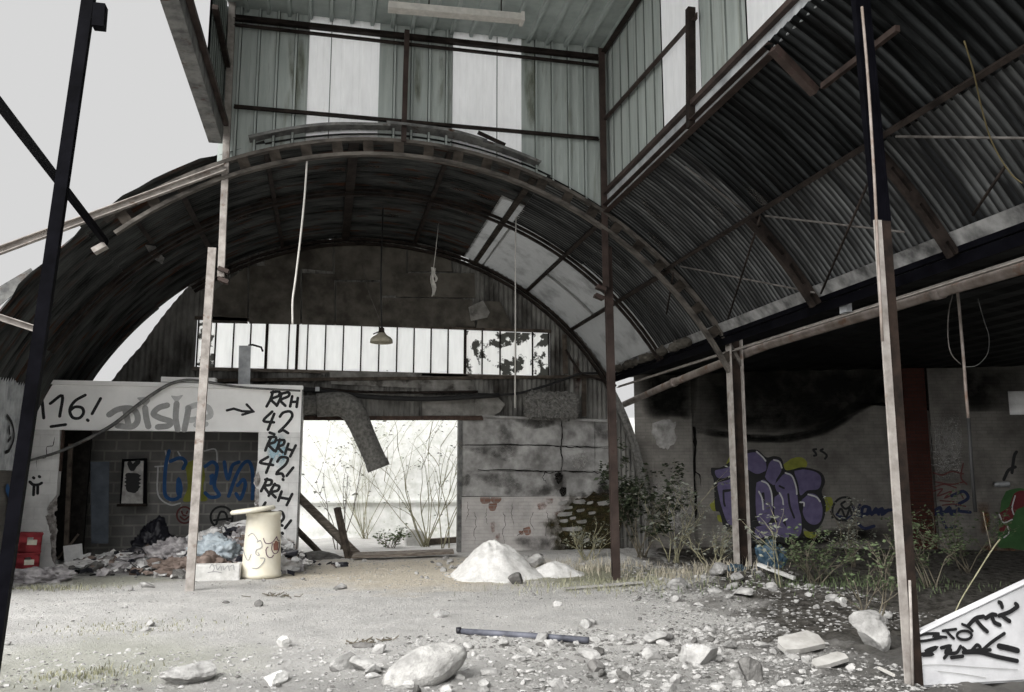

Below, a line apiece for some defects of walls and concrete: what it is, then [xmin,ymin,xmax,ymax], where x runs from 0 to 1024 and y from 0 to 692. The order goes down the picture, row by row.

leakage [645,372,729,438]
leakage [744,368,886,442]
leakage [939,367,1009,410]
crack [468,423,605,484]
peeling [480,497,501,511]